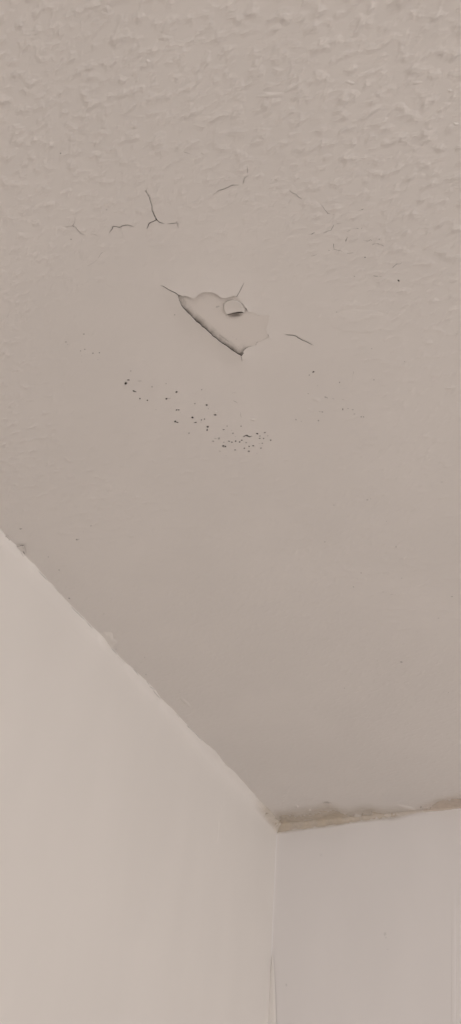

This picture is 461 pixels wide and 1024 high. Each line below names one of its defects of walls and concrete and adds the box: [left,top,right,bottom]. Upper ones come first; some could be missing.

crack [65,188,179,236]
peeling [144,262,294,381]
crack [285,333,314,346]